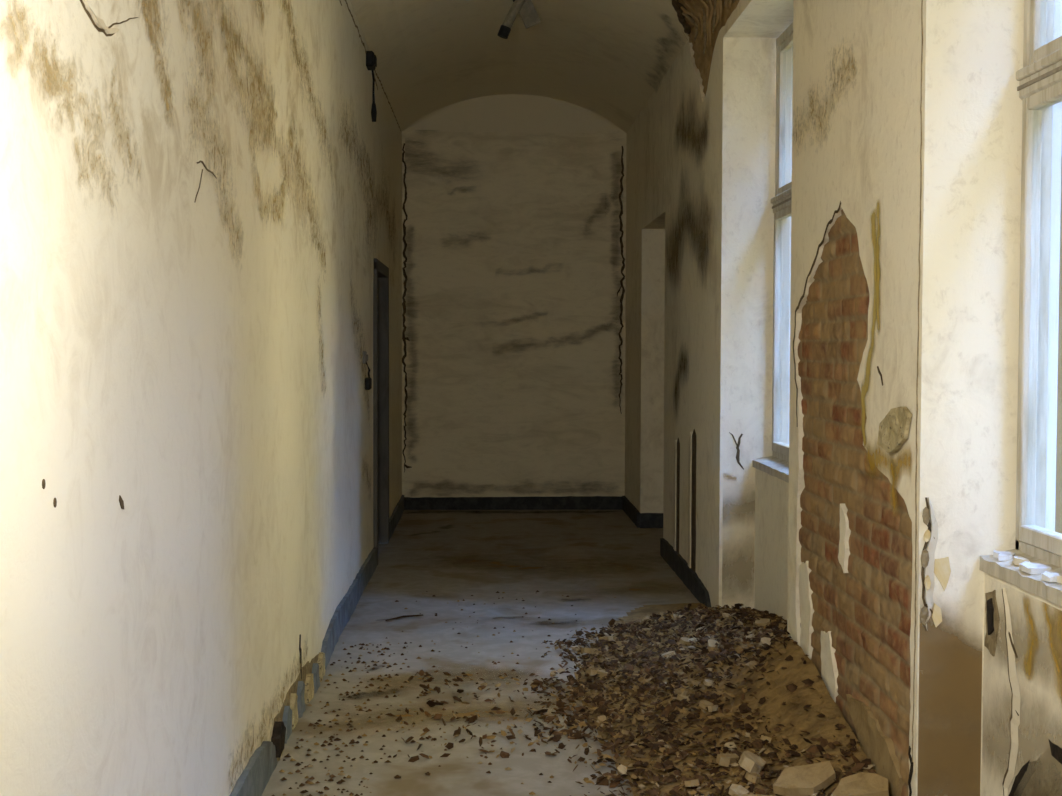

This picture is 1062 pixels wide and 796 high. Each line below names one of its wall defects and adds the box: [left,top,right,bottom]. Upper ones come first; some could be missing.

crack [80,0,139,37]
spalling [672,0,691,34]
damp [9,5,102,136]
damp [180,0,239,247]
damp [221,0,326,264]
crack [194,160,217,203]
flaking render [797,209,951,796]
flaking render [984,590,1000,656]
flaking render [1009,740,1062,796]